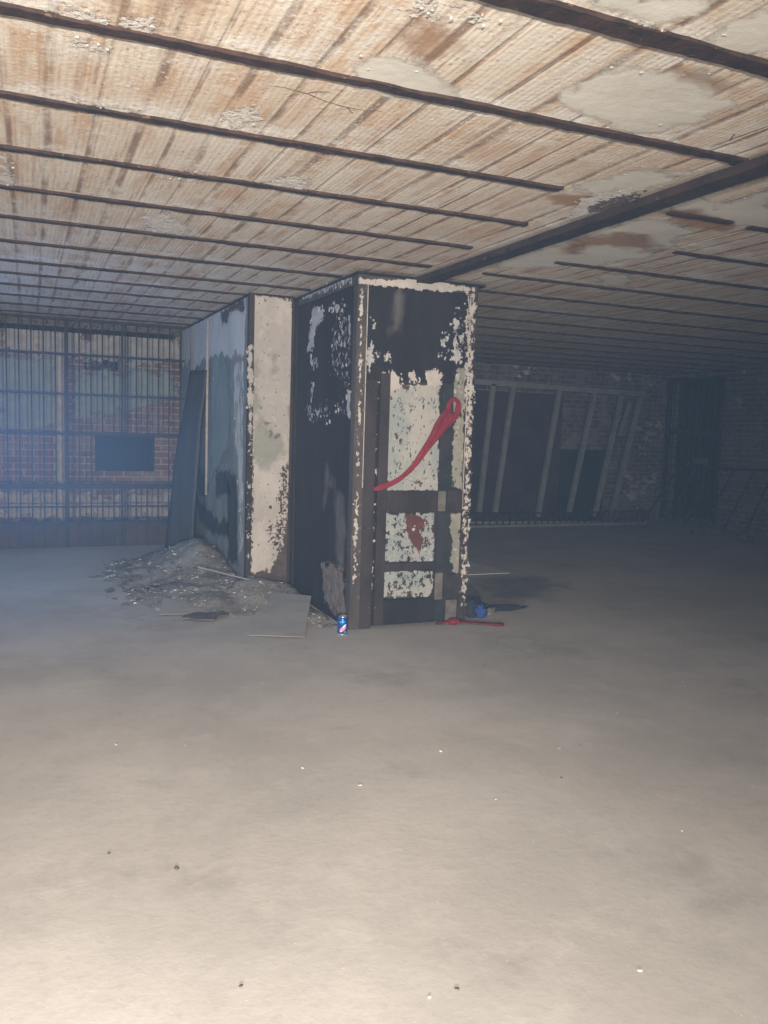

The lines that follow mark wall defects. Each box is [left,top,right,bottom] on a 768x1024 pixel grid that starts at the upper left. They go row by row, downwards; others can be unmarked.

damp [196,467,237,563]
peeling [0,277,478,616]